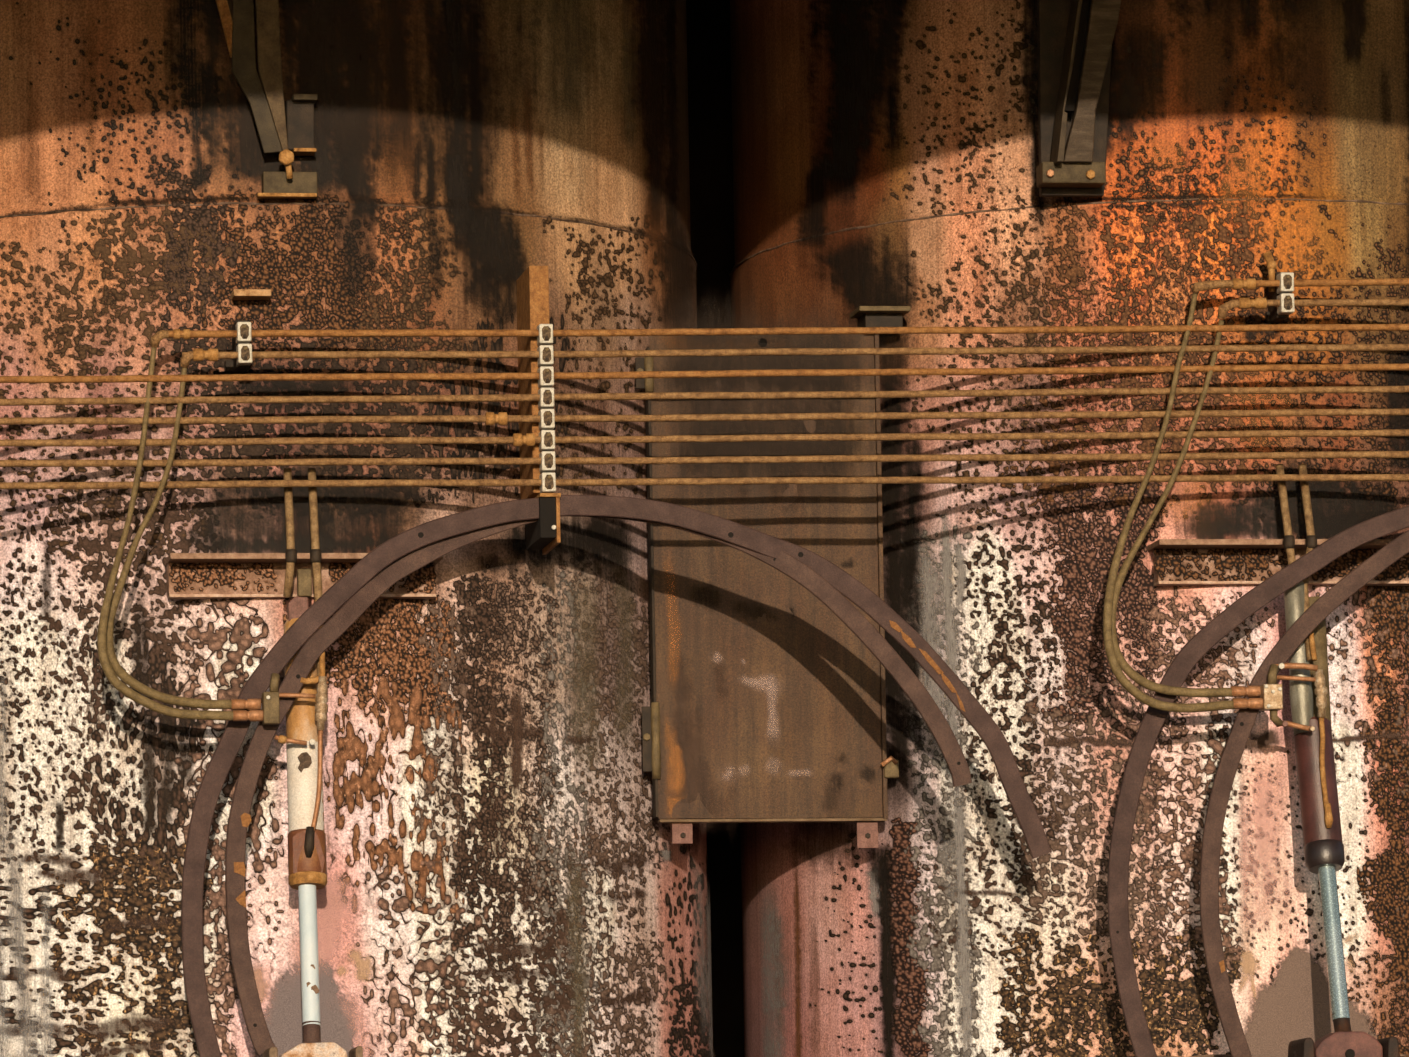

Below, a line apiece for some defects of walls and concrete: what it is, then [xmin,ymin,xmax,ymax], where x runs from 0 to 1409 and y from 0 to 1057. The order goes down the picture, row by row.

water stain [165,0,527,324]
water stain [800,0,916,322]
rust [776,0,1409,1057]
peeling [170,598,289,789]
peeling [222,739,250,800]
peeling [245,755,303,1057]
peeling [316,588,673,1057]
rust [389,554,712,1057]